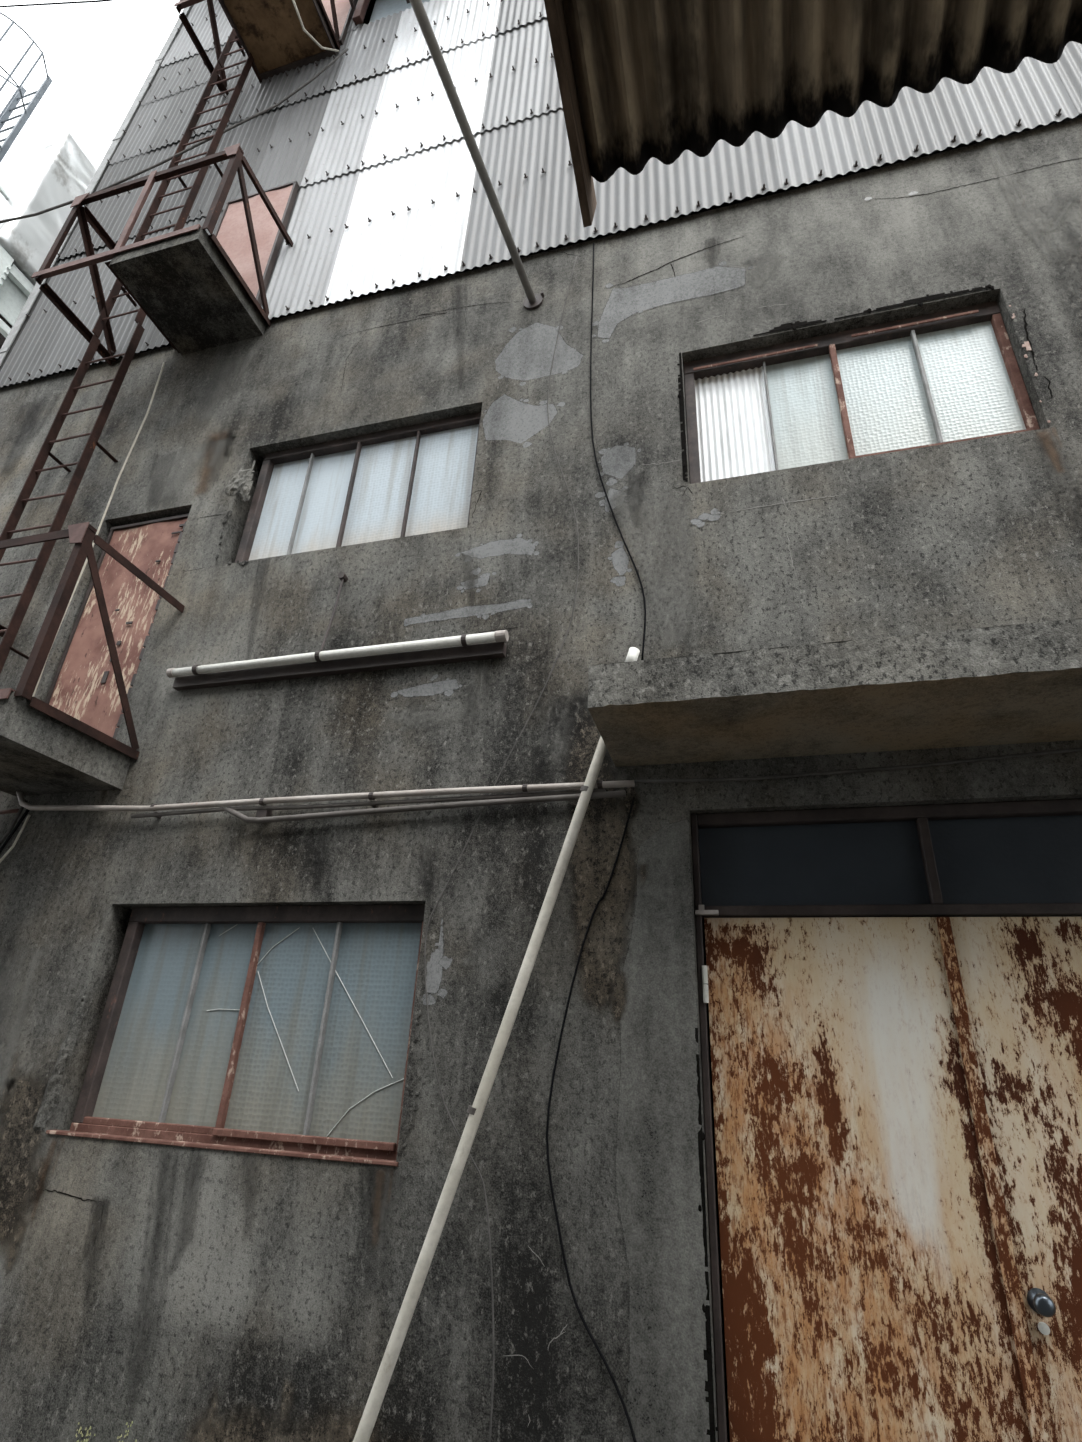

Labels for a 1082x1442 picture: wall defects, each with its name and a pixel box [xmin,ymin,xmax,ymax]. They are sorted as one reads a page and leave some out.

peeling [592,261,754,343]
peeling [483,322,583,448]
spalling [398,906,453,1158]
leakage [0,952,49,1272]
leakage [86,1200,108,1296]
leakage [127,1154,201,1412]
leakage [187,1380,408,1442]